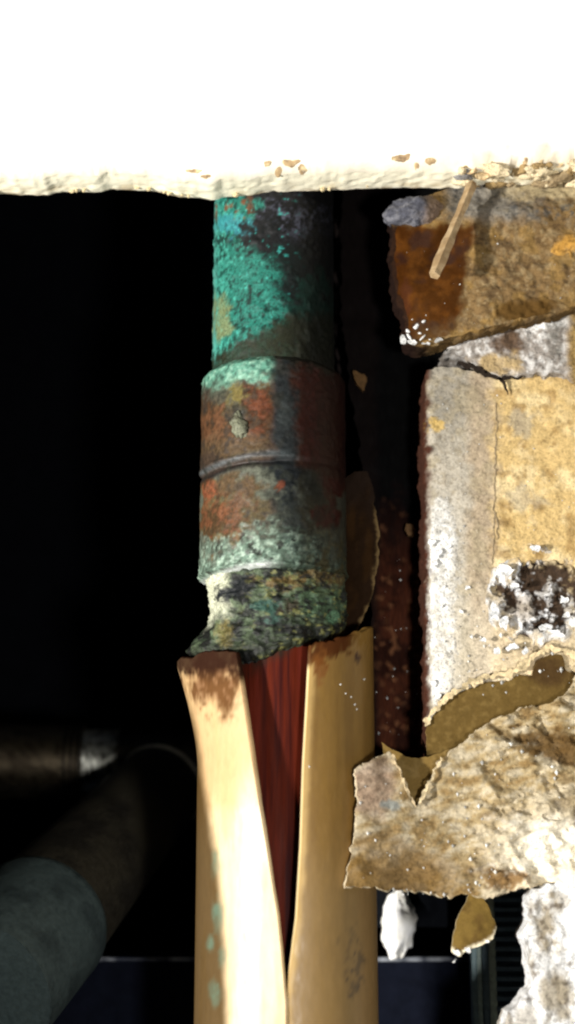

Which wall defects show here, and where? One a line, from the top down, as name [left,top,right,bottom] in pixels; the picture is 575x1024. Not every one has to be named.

crack [457,361,526,564]
peeling [381,543,575,805]
flaking render [497,876,575,1024]